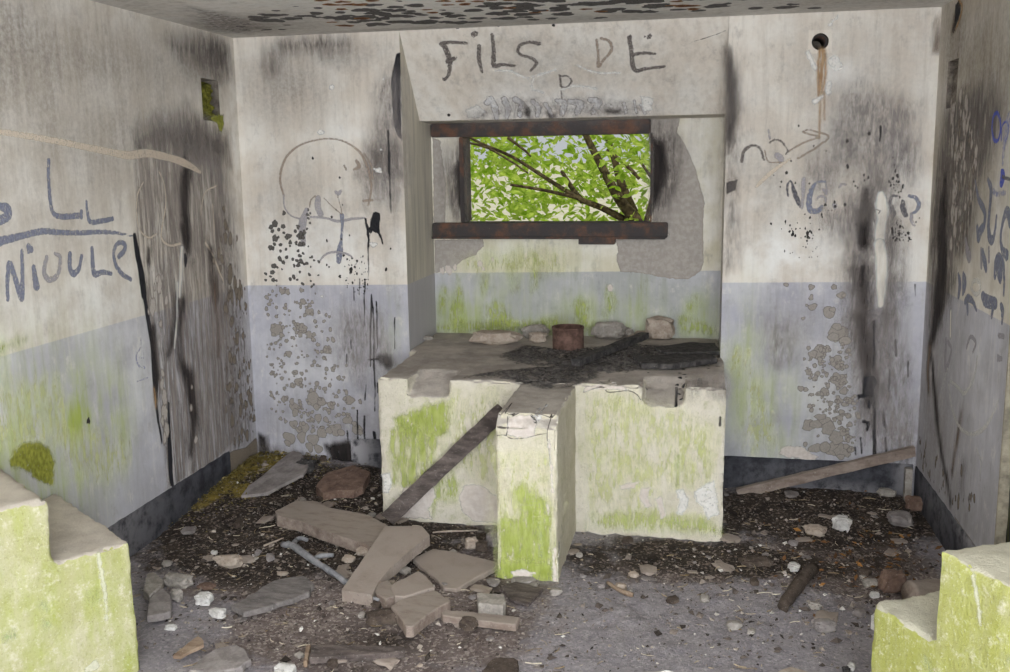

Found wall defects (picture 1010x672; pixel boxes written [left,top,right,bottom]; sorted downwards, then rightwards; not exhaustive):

peeling [238,0,732,30]
rust [818,48,826,93]
damp [133,155,198,487]
damp [205,242,224,356]
peeling [264,208,363,456]
peeling [779,284,861,460]
damp [854,188,890,455]
damp [927,174,964,505]